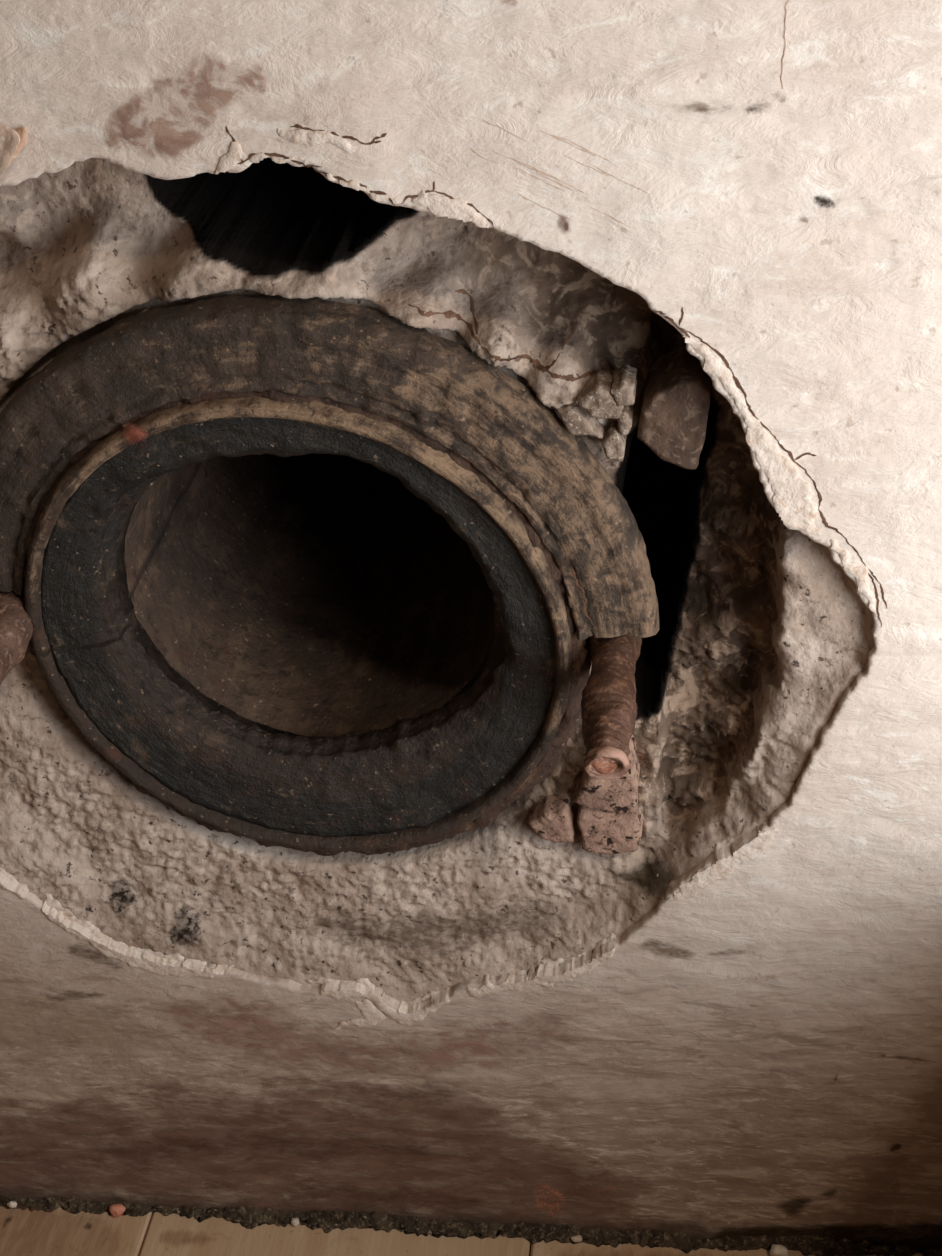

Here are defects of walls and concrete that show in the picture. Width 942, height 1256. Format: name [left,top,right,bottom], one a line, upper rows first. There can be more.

leakage [107,58,265,156]
crack [226,124,496,230]
crack [409,289,593,382]
crack [650,308,887,627]
spalling [0,124,876,1030]
leakage [70,947,120,969]
leakage [169,1000,507,1069]
leakage [0,1079,637,1230]
leakage [717,1200,942,1253]